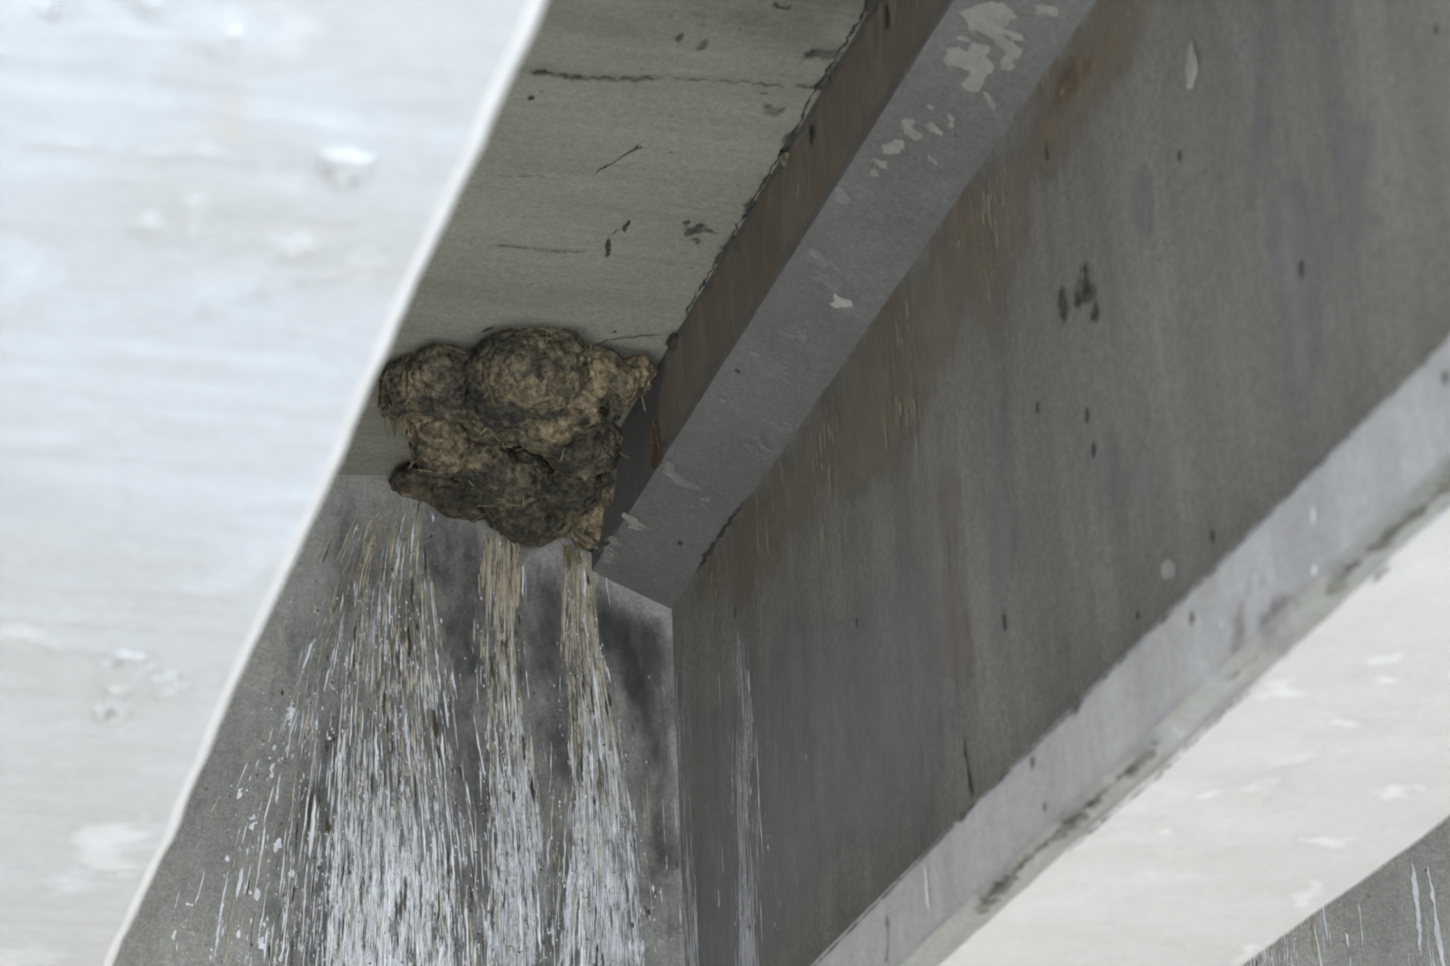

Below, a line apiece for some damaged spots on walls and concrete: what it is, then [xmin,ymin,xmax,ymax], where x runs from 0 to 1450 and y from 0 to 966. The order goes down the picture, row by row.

peeling [943,0,1024,109]
peeling [870,96,955,177]
peeling [830,294,853,308]
leakage [174,493,777,966]